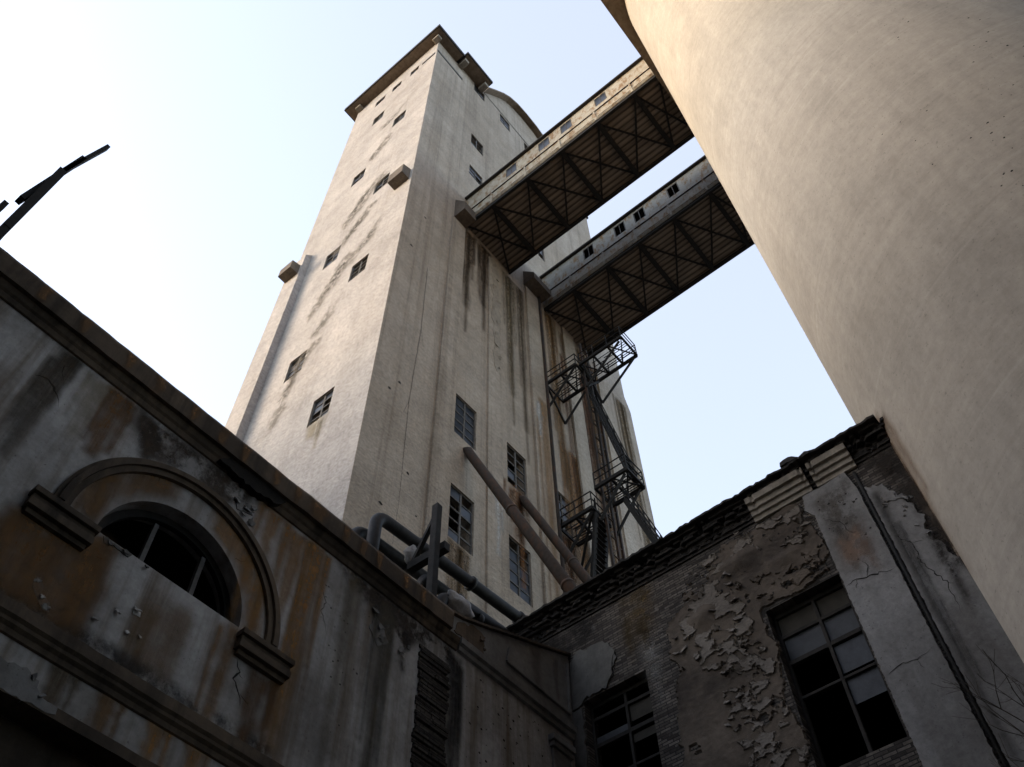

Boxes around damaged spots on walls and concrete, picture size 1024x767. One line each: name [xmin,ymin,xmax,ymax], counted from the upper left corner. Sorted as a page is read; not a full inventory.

damp [463,231,475,305]
damp [503,272,541,427]
corrosion [86,388,135,455]
corrosion [541,308,622,583]
corrosion [312,500,326,519]
crack [848,561,894,585]
crack [898,536,960,609]
peeling [671,505,822,767]
crack [232,659,244,699]